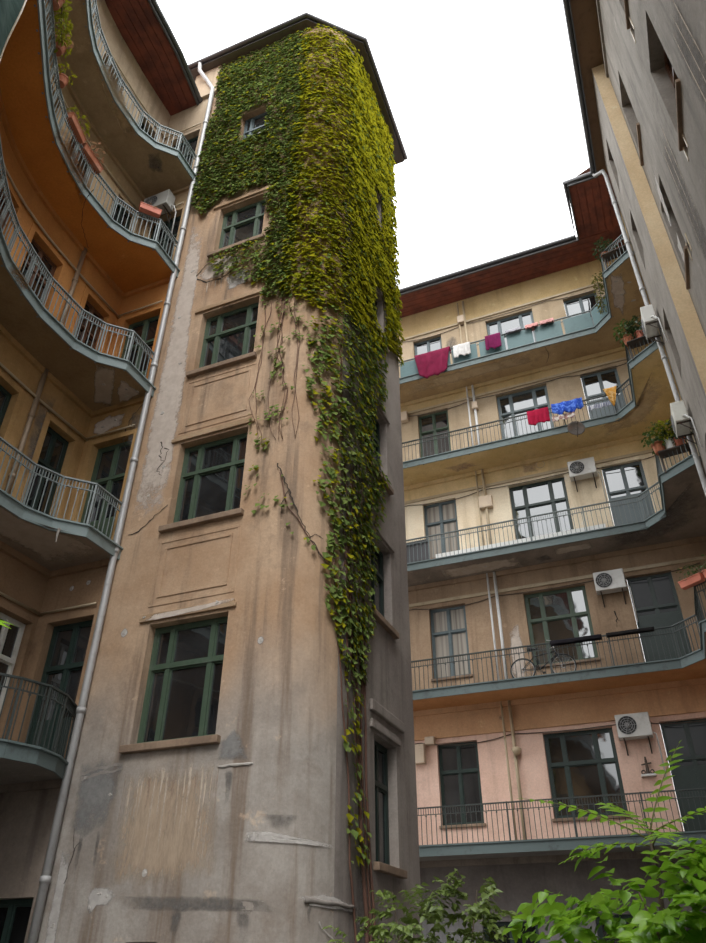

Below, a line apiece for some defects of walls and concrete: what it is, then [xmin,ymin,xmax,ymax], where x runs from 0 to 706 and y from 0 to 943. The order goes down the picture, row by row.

peeling [94,415,123,434]
damp [116,767,231,878]